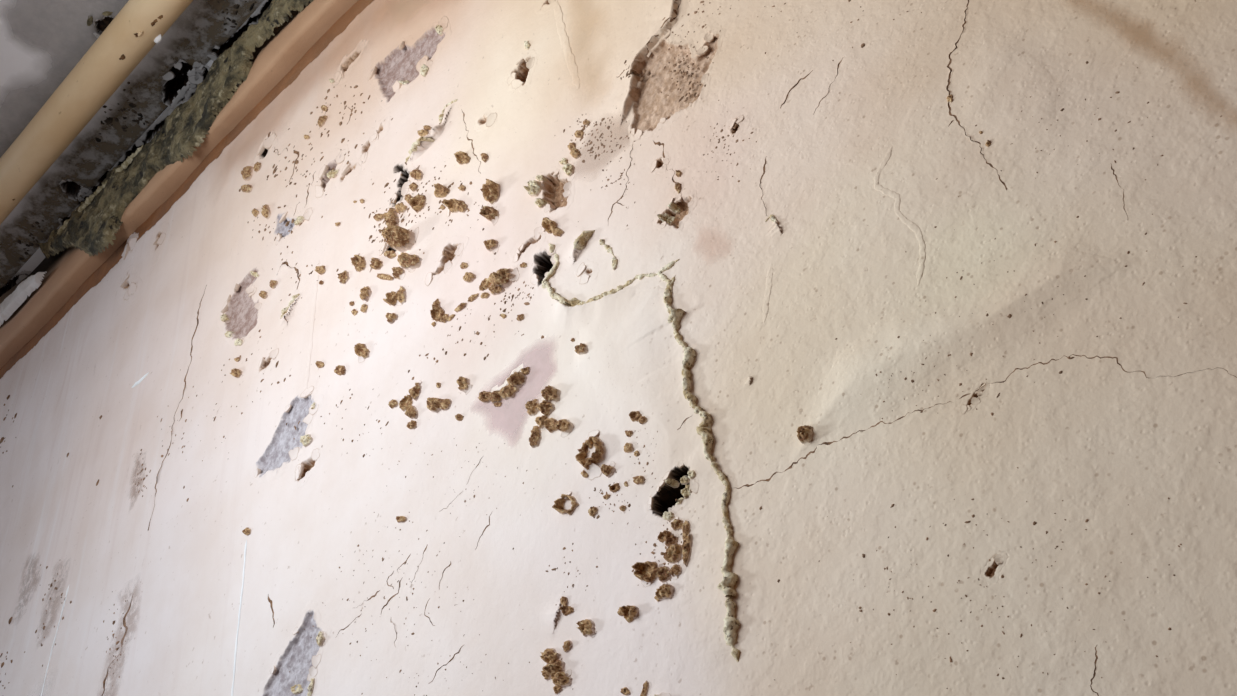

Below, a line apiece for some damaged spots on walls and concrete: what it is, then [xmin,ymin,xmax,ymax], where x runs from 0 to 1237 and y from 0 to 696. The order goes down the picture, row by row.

leakage [0,0,313,289]
peeling [217,261,266,350]
peeling [270,16,457,261]
flaking render [447,158,637,334]
spalling [594,0,726,145]
spalling [653,190,699,235]
crack [946,0,1007,190]
crack [148,285,207,530]
peeling [250,386,324,491]
spalling [644,455,700,525]
crack [569,259,1237,662]
peeling [258,600,332,696]